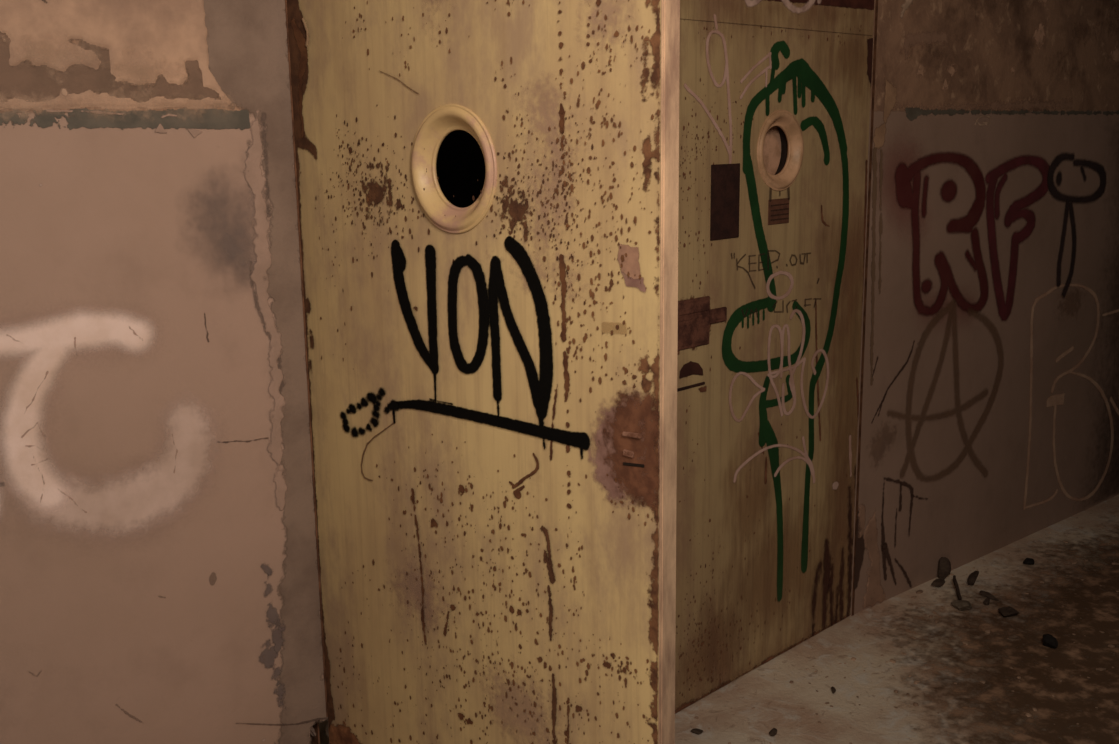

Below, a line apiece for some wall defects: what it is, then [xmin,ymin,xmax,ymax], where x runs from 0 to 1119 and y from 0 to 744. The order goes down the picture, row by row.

flaking render [0,0,236,133]
corrosion [315,114,430,278]
peeling [250,270,271,340]
corrosion [287,0,322,574]
corrosion [376,0,661,744]
corrosion [321,592,375,744]